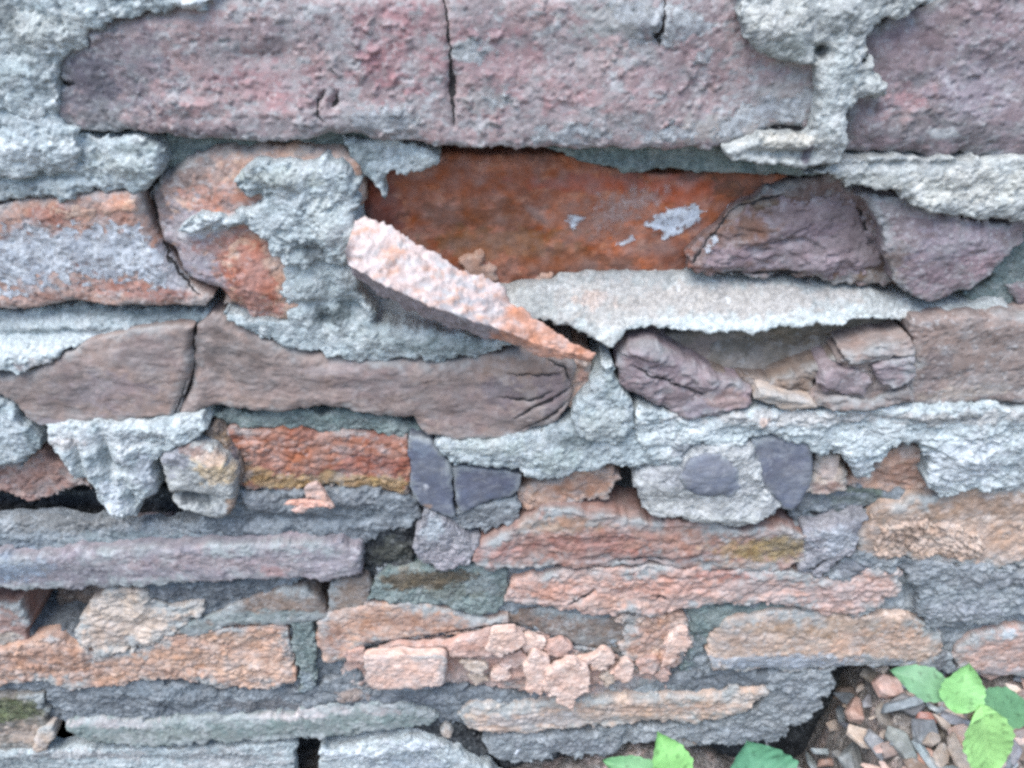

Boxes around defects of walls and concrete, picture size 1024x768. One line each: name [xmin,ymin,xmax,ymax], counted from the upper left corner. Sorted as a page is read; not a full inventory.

crack [443,0,456,124]